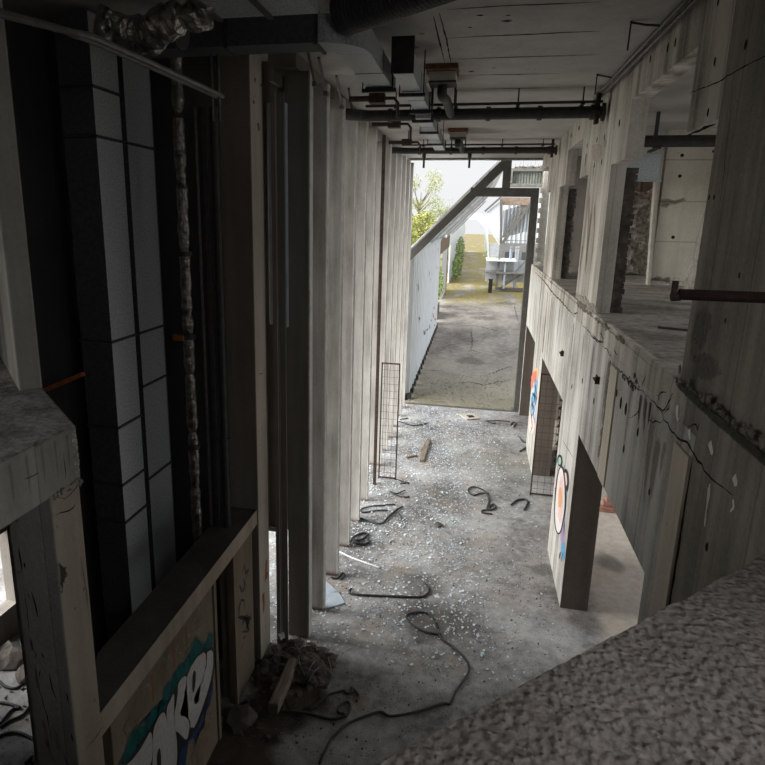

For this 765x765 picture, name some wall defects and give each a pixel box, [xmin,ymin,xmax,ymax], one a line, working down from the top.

crack [686,56,765,230]
crack [534,268,733,605]
spalling [674,364,765,466]